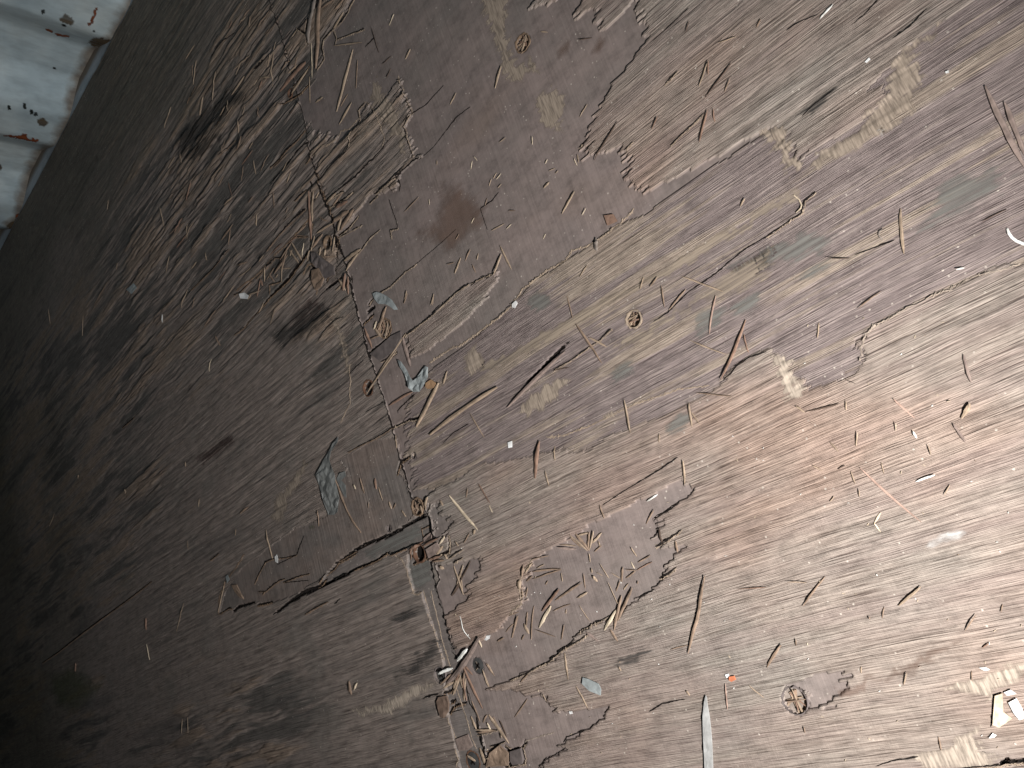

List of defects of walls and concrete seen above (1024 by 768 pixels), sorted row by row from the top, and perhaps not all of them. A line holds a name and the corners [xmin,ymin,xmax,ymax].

rust [89,38,111,47]
peeling [220,0,760,768]
crack [219,514,463,615]